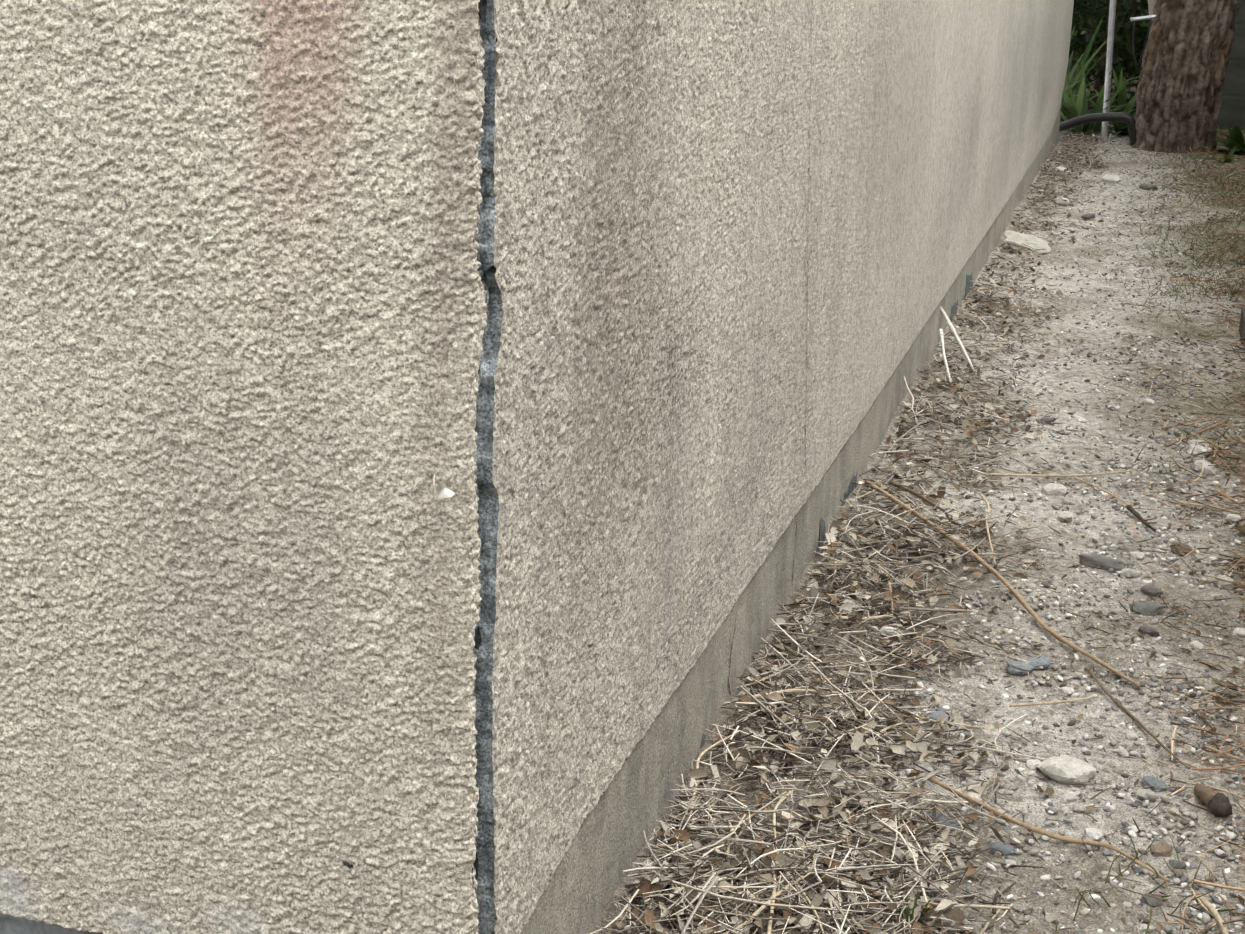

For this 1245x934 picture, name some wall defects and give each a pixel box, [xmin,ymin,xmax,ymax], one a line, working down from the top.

crack [472,0,502,934]